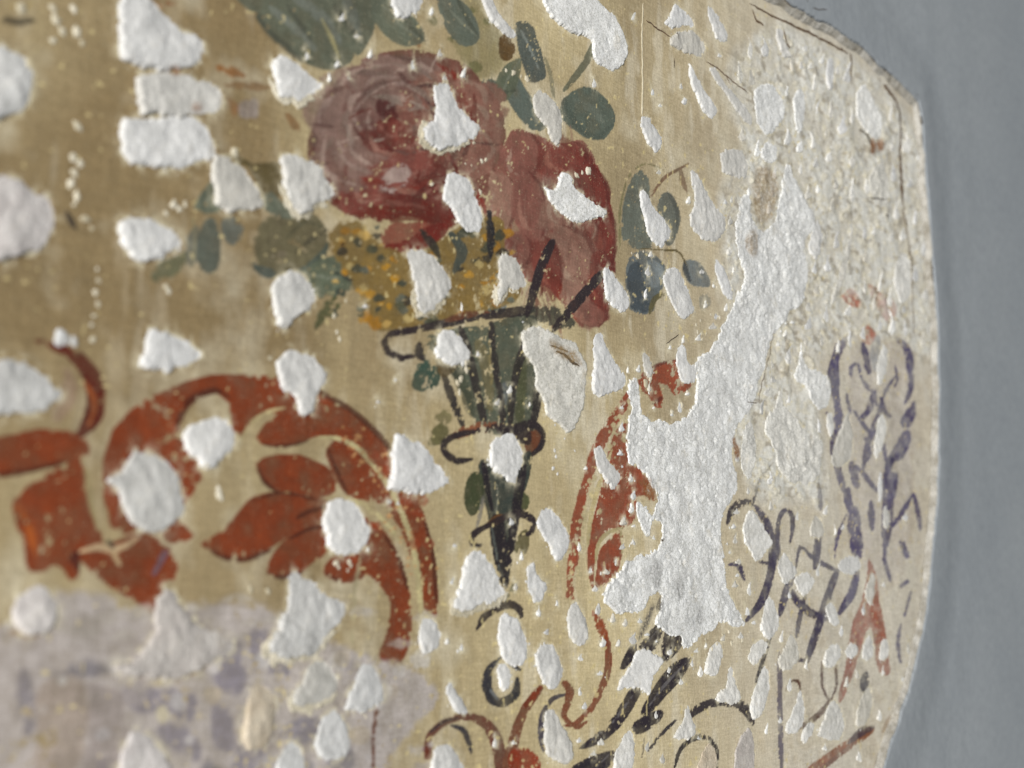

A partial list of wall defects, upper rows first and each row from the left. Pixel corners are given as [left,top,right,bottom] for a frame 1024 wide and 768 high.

spalling [117,0,264,215]
spalling [418,74,480,156]
spalling [0,175,55,262]
spalling [0,358,63,415]
spalling [276,349,327,416]
peeling [521,0,939,768]
spalling [106,450,185,533]
spalling [182,417,235,470]
spalling [322,497,370,556]
spalling [387,433,449,505]
spalling [449,550,563,692]
spalling [239,572,384,768]